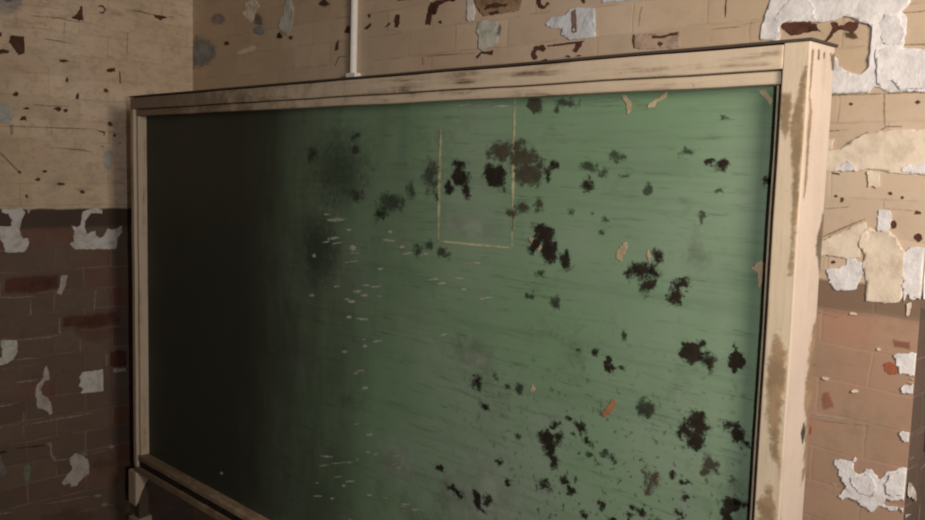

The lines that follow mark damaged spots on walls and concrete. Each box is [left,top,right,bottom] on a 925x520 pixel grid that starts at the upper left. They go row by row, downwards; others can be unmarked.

spalling [425,0,455,25]
peeling [466,0,522,59]
peeling [531,0,628,61]
peeling [760,0,925,105]
peeling [826,126,925,188]
peeling [0,195,31,253]
peeling [70,207,122,250]
peeling [821,209,925,316]
spalling [0,290,117,370]
peeling [0,366,95,434]
peeling [17,442,115,487]
peeling [832,457,920,520]